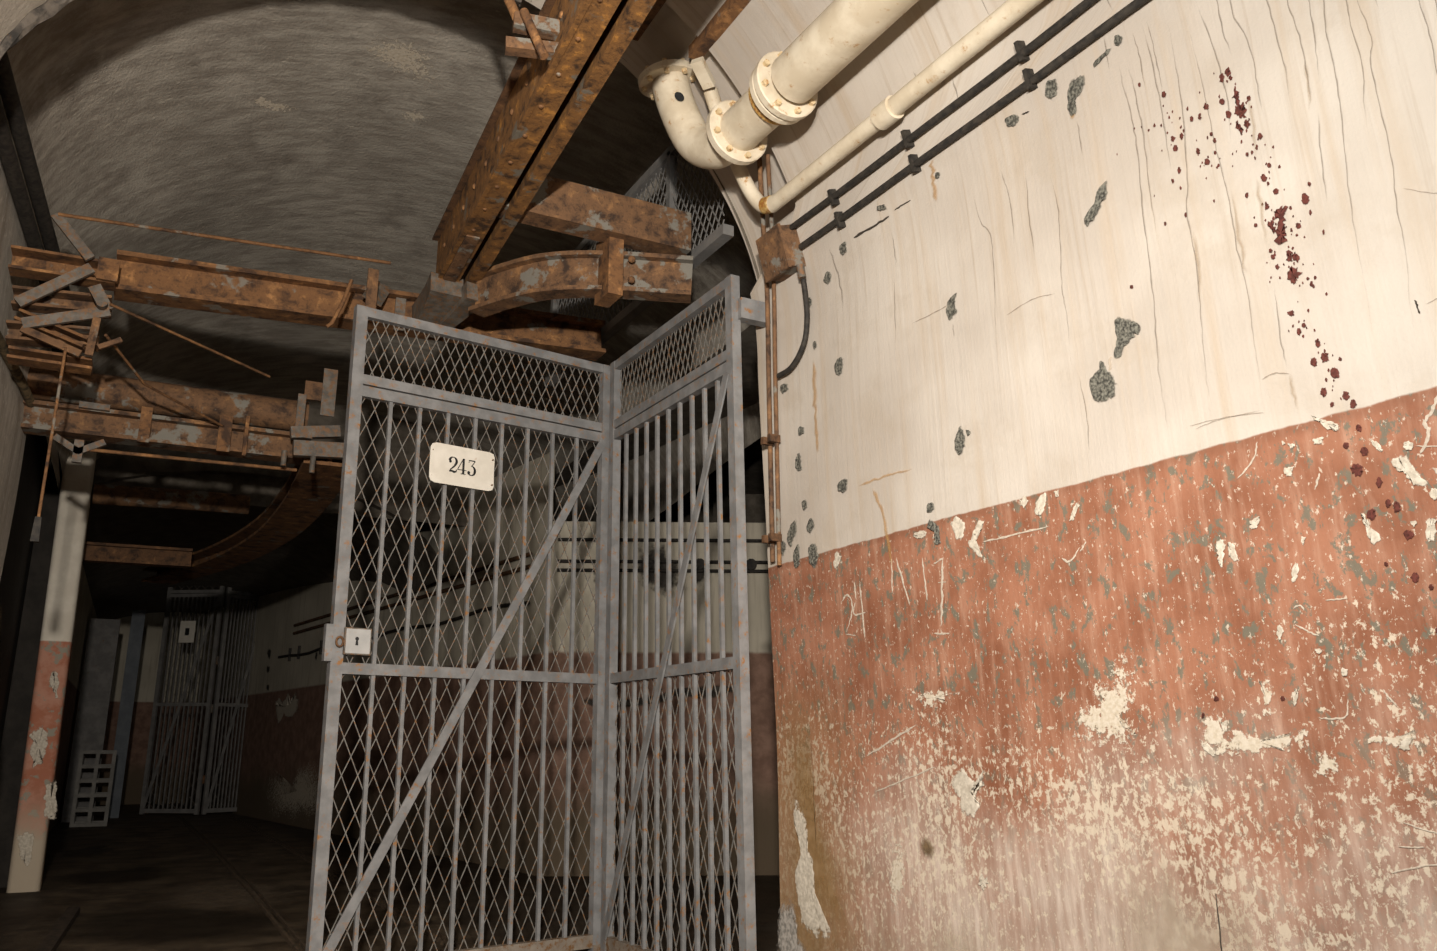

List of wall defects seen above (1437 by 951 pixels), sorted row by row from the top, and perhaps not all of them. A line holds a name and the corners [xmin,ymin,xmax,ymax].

spalling [1084,181,1107,226]
spalling [1089,317,1140,402]
peeling [1371,396,1437,500]
peeling [1361,513,1381,545]
peeling [1410,518,1437,542]
peeling [1216,539,1238,567]
peeling [1202,720,1308,757]
peeling [43,782,57,819]
peeling [952,768,985,818]
peeling [793,800,830,938]
water stain [889,836,904,906]
water stain [922,840,932,855]